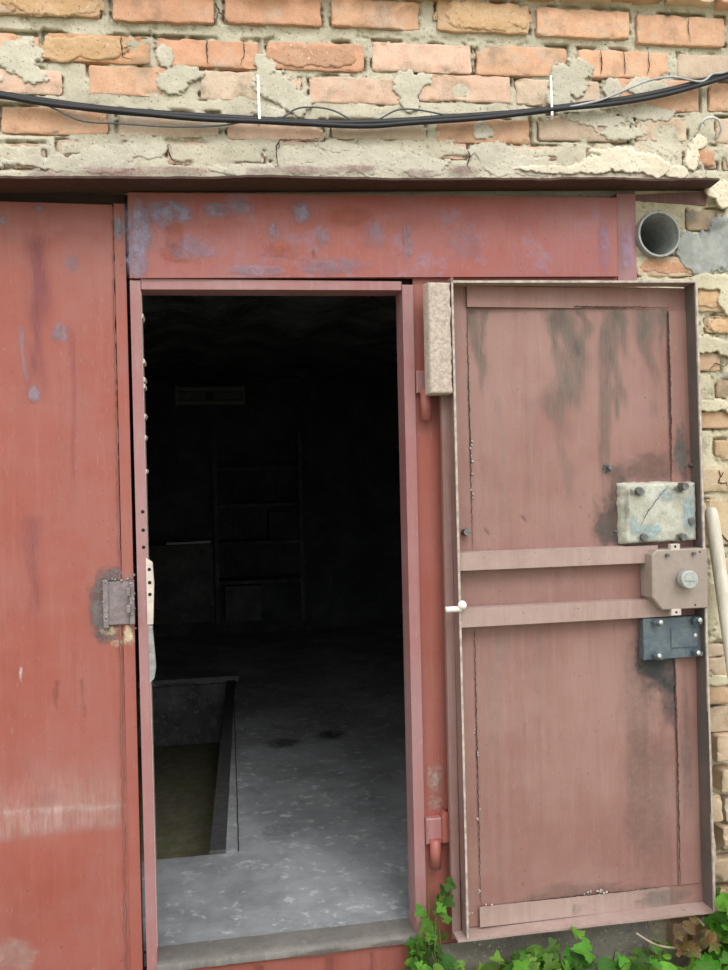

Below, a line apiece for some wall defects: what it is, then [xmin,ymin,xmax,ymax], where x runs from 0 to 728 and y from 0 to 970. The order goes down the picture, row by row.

spalling [514,133,715,179]
peeling [115,201,190,276]
spalling [640,259,692,274]